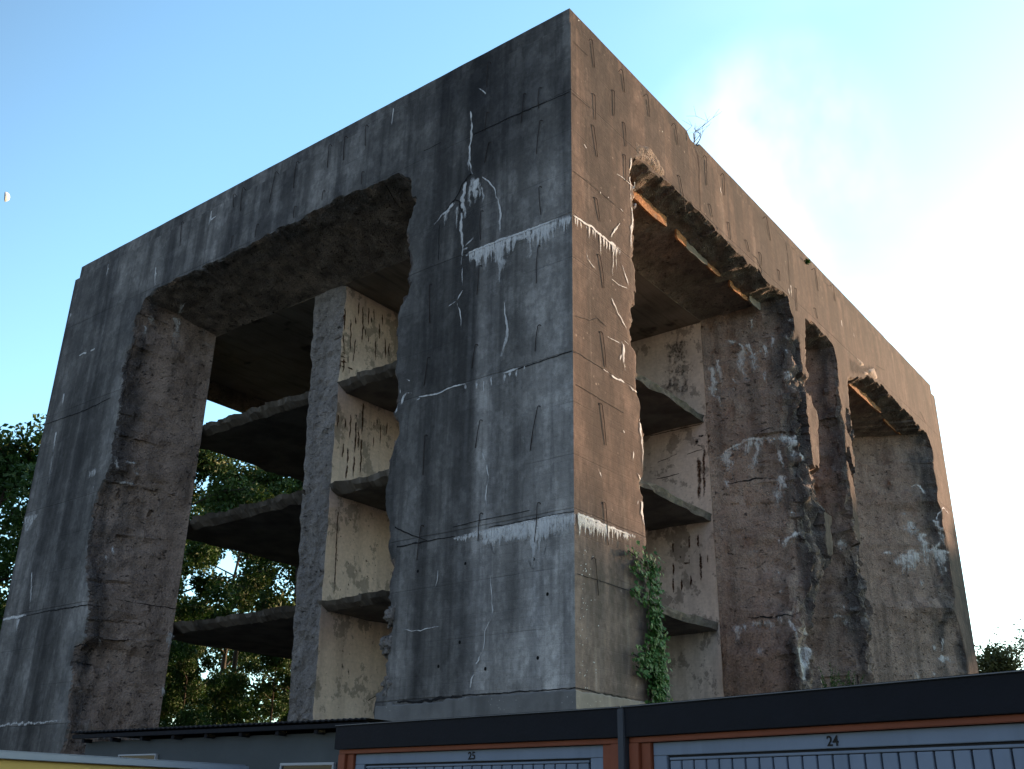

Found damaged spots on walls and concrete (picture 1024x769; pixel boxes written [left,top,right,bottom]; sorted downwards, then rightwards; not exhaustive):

crack [438,91,591,260]
water stain [439,202,617,274]
spalling [850,358,884,379]
water stain [724,435,803,498]
water stain [454,513,635,564]
water stain [885,520,949,571]